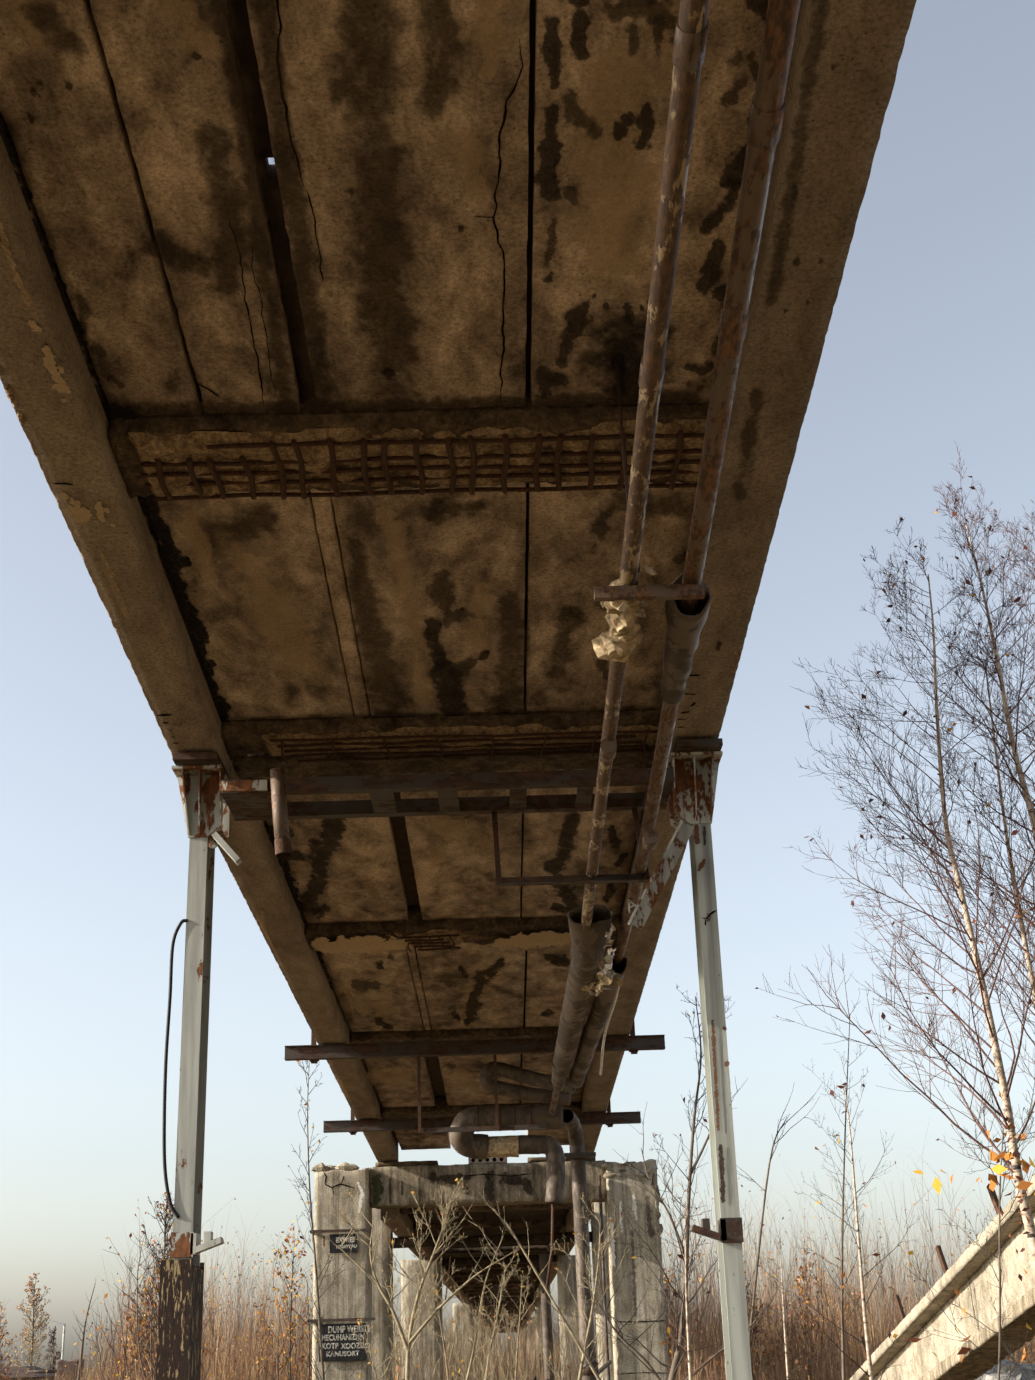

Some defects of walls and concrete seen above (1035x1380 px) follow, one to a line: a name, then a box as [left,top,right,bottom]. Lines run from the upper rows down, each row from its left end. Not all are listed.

damp [107,0,649,418]
crack [475,40,524,396]
damp [533,0,676,205]
damp [696,116,750,306]
damp [767,0,828,303]
spalling [128,420,636,502]
spalling [649,419,707,490]
damp [423,571,528,717]
damp [273,818,346,919]
spalling [311,929,470,956]
damp [451,958,505,1026]
spalling [493,930,571,950]